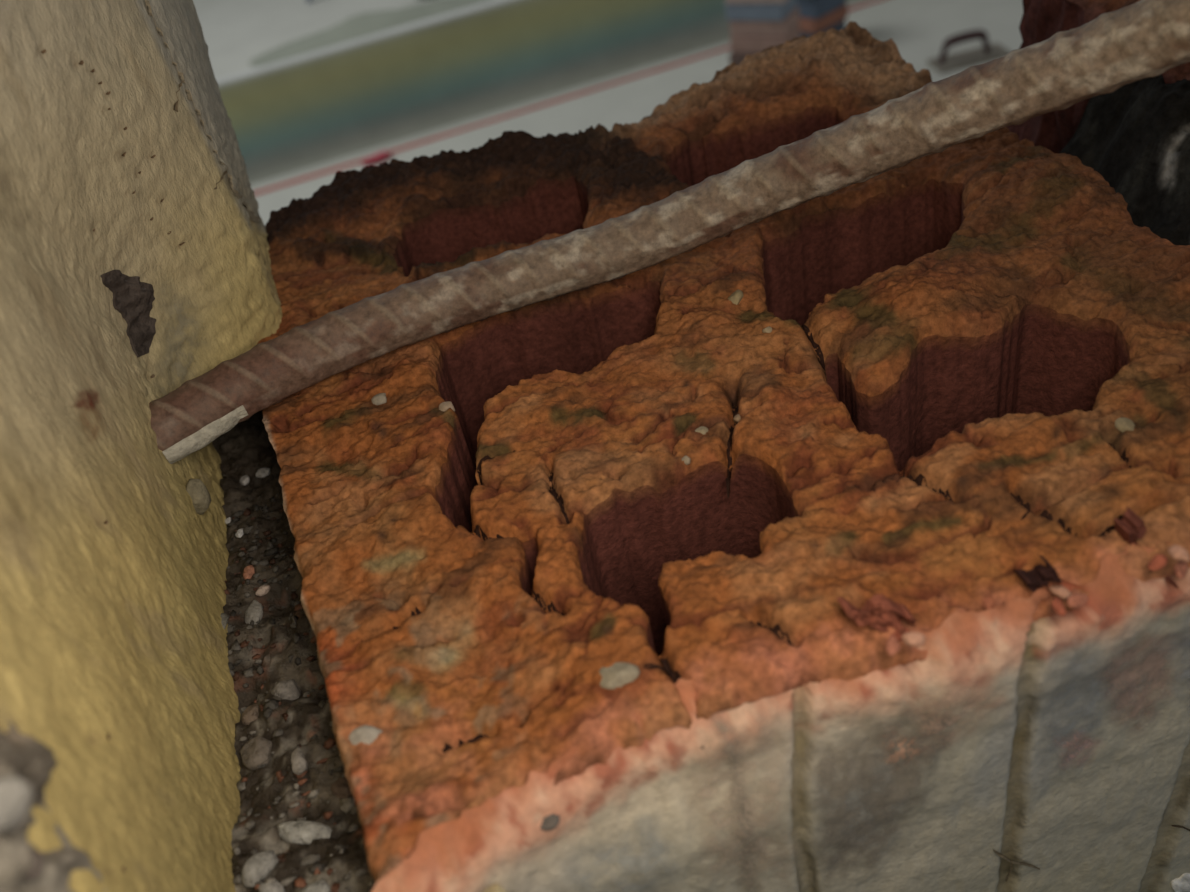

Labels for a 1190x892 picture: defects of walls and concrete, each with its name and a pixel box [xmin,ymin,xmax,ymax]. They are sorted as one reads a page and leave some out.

spalling [100,270,156,358]
crack [802,324,826,376]
crack [726,403,738,498]
crack [472,525,504,541]
crack [549,470,570,524]
crack [899,470,953,502]
crack [1011,492,1147,537]
crack [531,590,566,616]
crack [750,621,794,647]
crack [643,657,682,684]
crack [442,734,489,753]
damp [817,718,944,870]